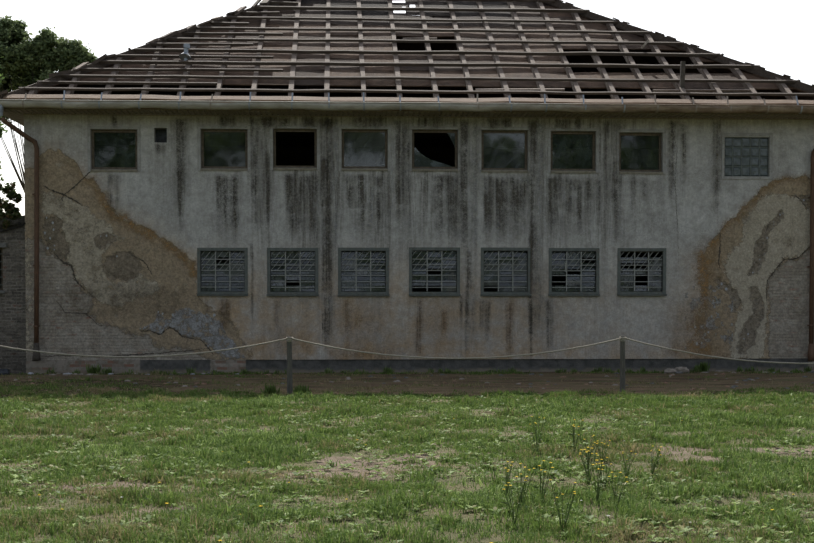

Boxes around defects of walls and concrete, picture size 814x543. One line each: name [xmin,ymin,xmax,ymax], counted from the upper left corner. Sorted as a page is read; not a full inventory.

crack [44,172,90,205]
water stain [484,178,534,228]
crack [54,253,85,290]
spalling [0,148,253,360]
water stain [286,150,332,341]
spalling [685,175,810,359]
crack [766,248,808,301]